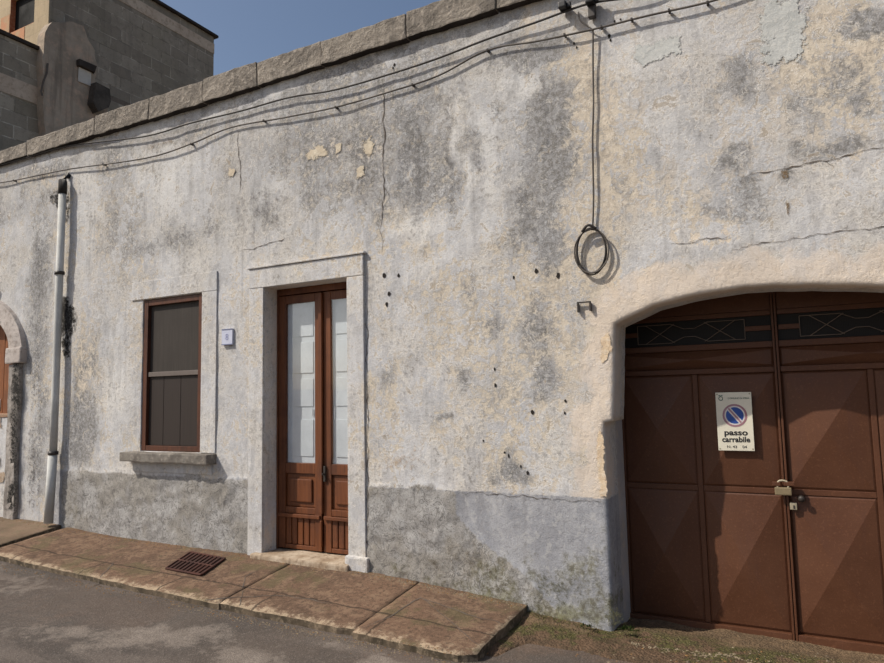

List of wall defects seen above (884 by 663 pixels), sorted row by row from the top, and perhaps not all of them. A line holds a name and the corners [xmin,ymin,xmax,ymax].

peeling [306,143,341,160]
peeling [361,135,375,156]
crack [738,147,884,179]
crack [672,226,884,251]
water stain [61,297,77,357]
water stain [6,363,21,511]